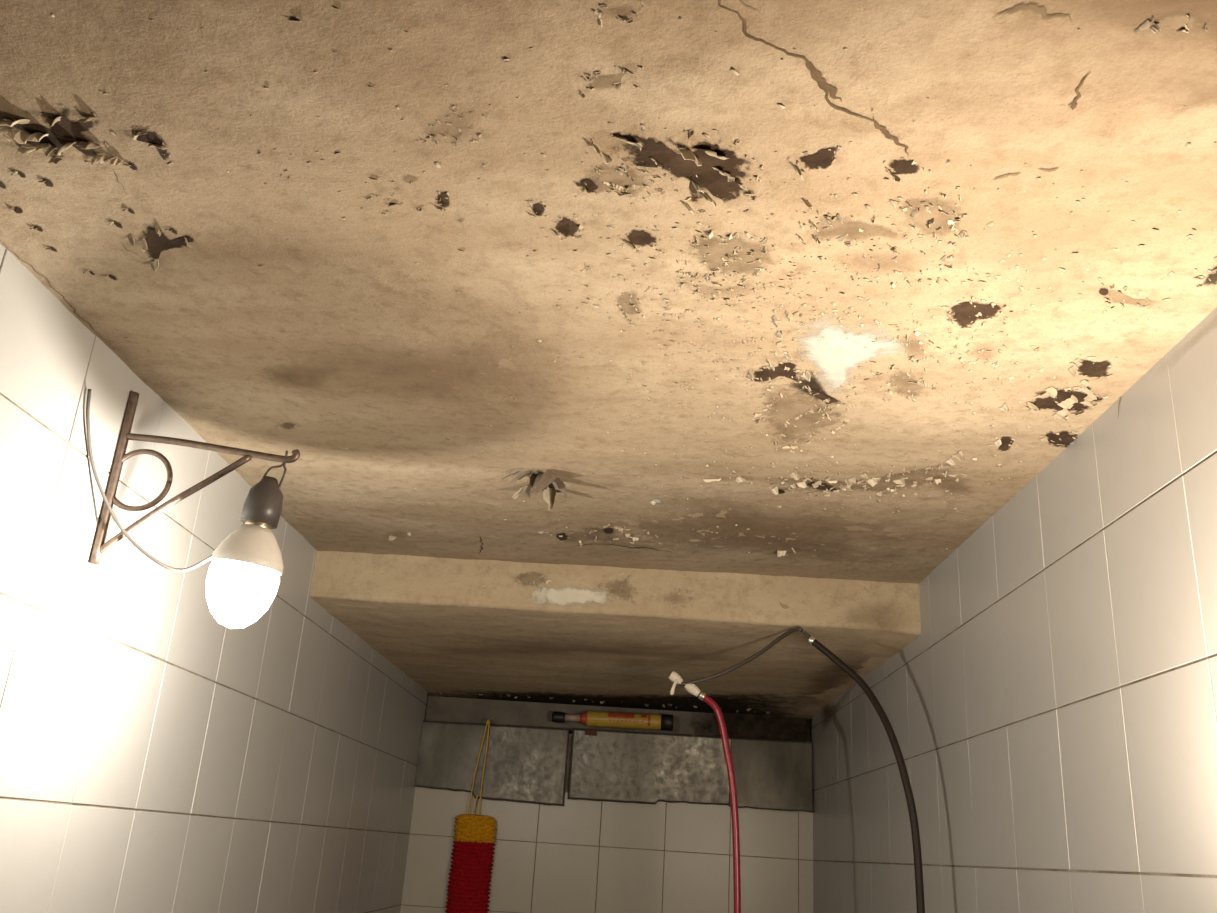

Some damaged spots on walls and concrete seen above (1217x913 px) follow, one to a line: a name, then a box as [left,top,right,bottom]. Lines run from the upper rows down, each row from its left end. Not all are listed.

crack [719,0,908,154]
peeling [0,104,194,271]
peeling [575,124,764,215]
peeling [622,226,661,252]
peeling [676,230,776,305]
flaking render [1194,257,1217,287]
peeling [746,310,936,452]
peeling [999,357,1119,447]
peeling [501,468,568,511]
peeling [767,451,977,497]
peeling [989,437,1015,452]
peeling [538,524,649,546]